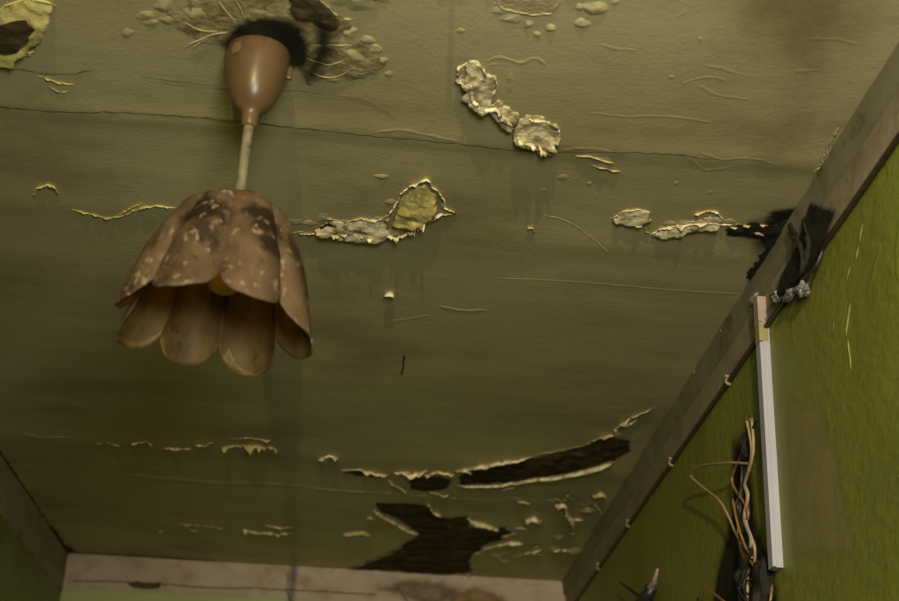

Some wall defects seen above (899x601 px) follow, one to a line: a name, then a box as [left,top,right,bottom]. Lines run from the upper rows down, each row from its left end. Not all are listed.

peeling [0,0,56,70]
peeling [455,55,561,157]
peeling [576,155,621,172]
peeling [288,178,457,245]
peeling [611,209,741,240]
peeling [222,437,279,455]
flaking render [318,407,656,578]
water stain [397,583,502,601]